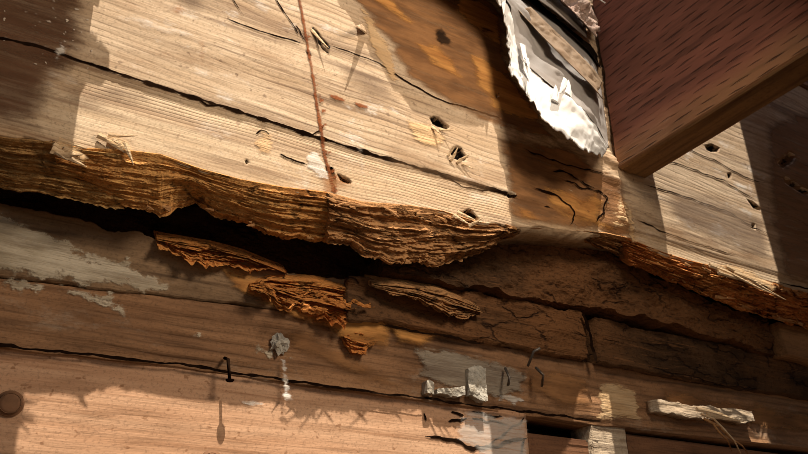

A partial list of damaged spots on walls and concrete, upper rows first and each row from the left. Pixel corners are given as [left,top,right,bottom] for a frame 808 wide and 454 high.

corrosion [298,0,344,193]
crack [0,37,550,208]
peeling [307,152,328,179]
peeling [321,195,368,211]
peeling [416,212,471,223]
leakage [0,216,168,313]
leakage [227,271,282,305]
peeling [258,280,371,312]
leakage [291,297,435,344]
crack [0,343,601,452]